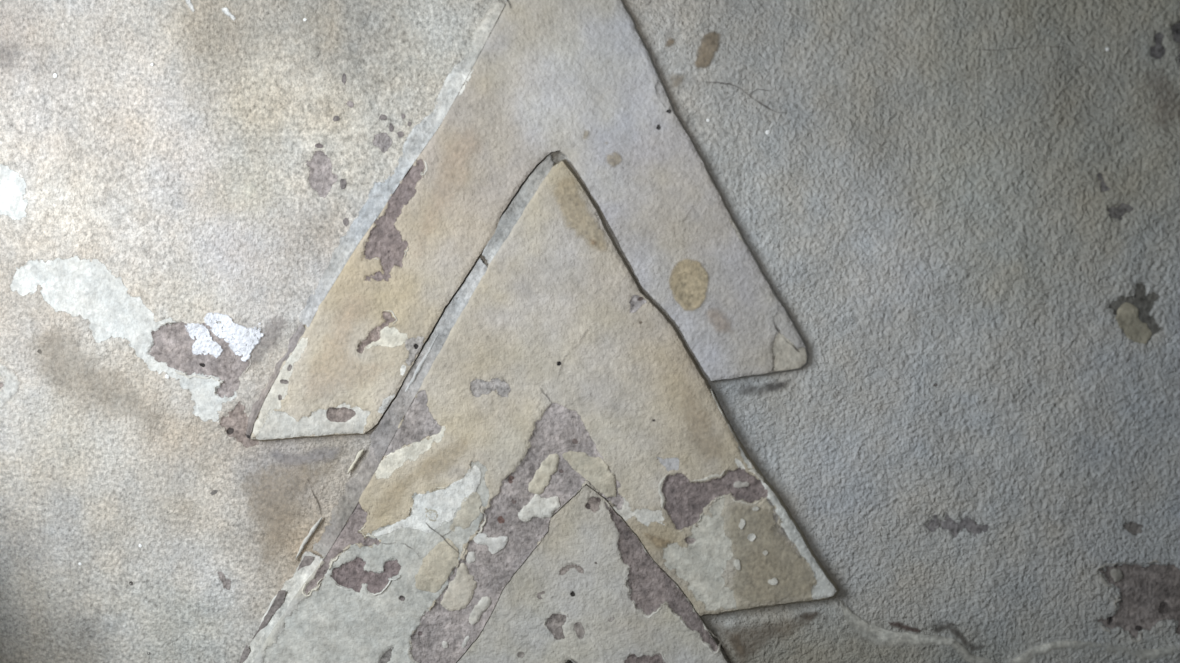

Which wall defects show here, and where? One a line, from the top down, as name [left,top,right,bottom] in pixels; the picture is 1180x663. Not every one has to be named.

spalling [1150,23,1180,63]
spalling [306,143,347,198]
spalling [364,159,428,281]
peeling [10,256,395,448]
spalling [1108,283,1163,344]
peeling [263,390,992,663]
spalling [1123,522,1143,535]
spalling [1013,560,1180,663]